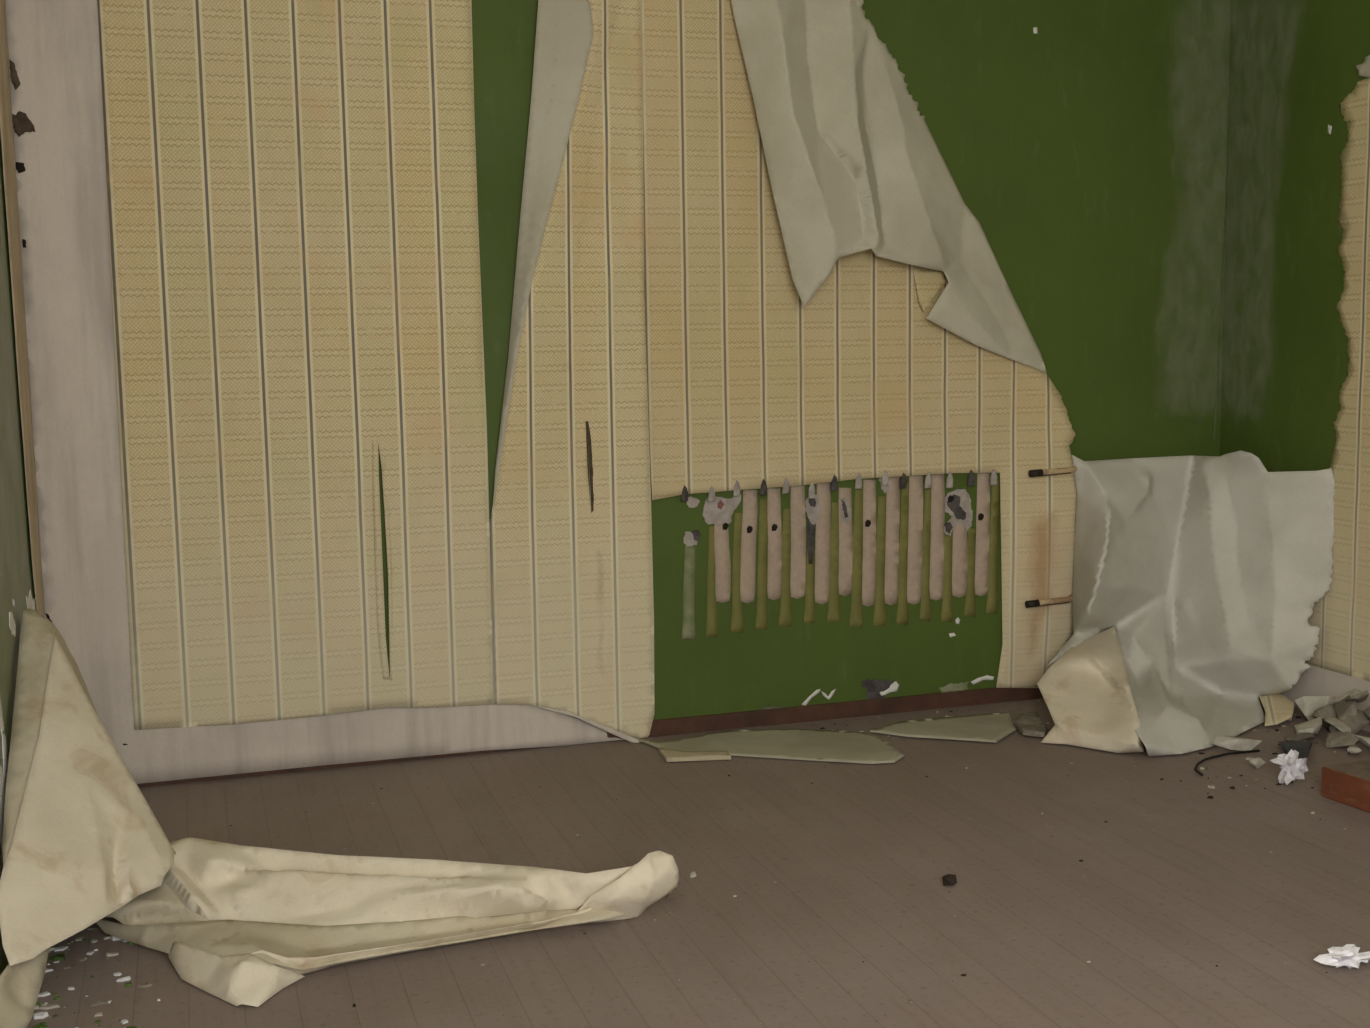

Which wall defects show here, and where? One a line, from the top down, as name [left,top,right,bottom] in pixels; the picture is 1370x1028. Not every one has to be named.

flaking render [683,494,741,547]
flaking render [838,497,852,524]
flaking render [944,489,973,536]
peeling [9,590,36,637]
peeling [802,689,836,706]
flaking render [861,678,899,699]
peeling [940,675,994,693]
peeling [0,700,8,873]